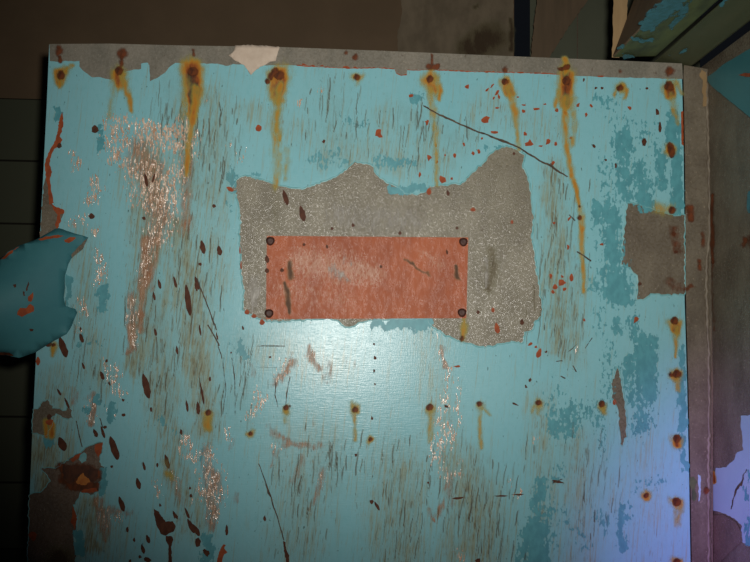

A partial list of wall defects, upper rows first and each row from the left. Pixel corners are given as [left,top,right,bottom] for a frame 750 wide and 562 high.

peeling [0,106,106,365]
rust [111,49,133,113]
rust [180,49,204,177]
rust [265,65,289,147]
peeling [226,132,557,360]
rust [421,54,443,186]
rust [499,67,520,150]
rust [554,56,586,293]
peeling [533,87,686,461]
peeling [26,357,151,562]
peeling [186,377,211,414]
crack [259,464,289,562]